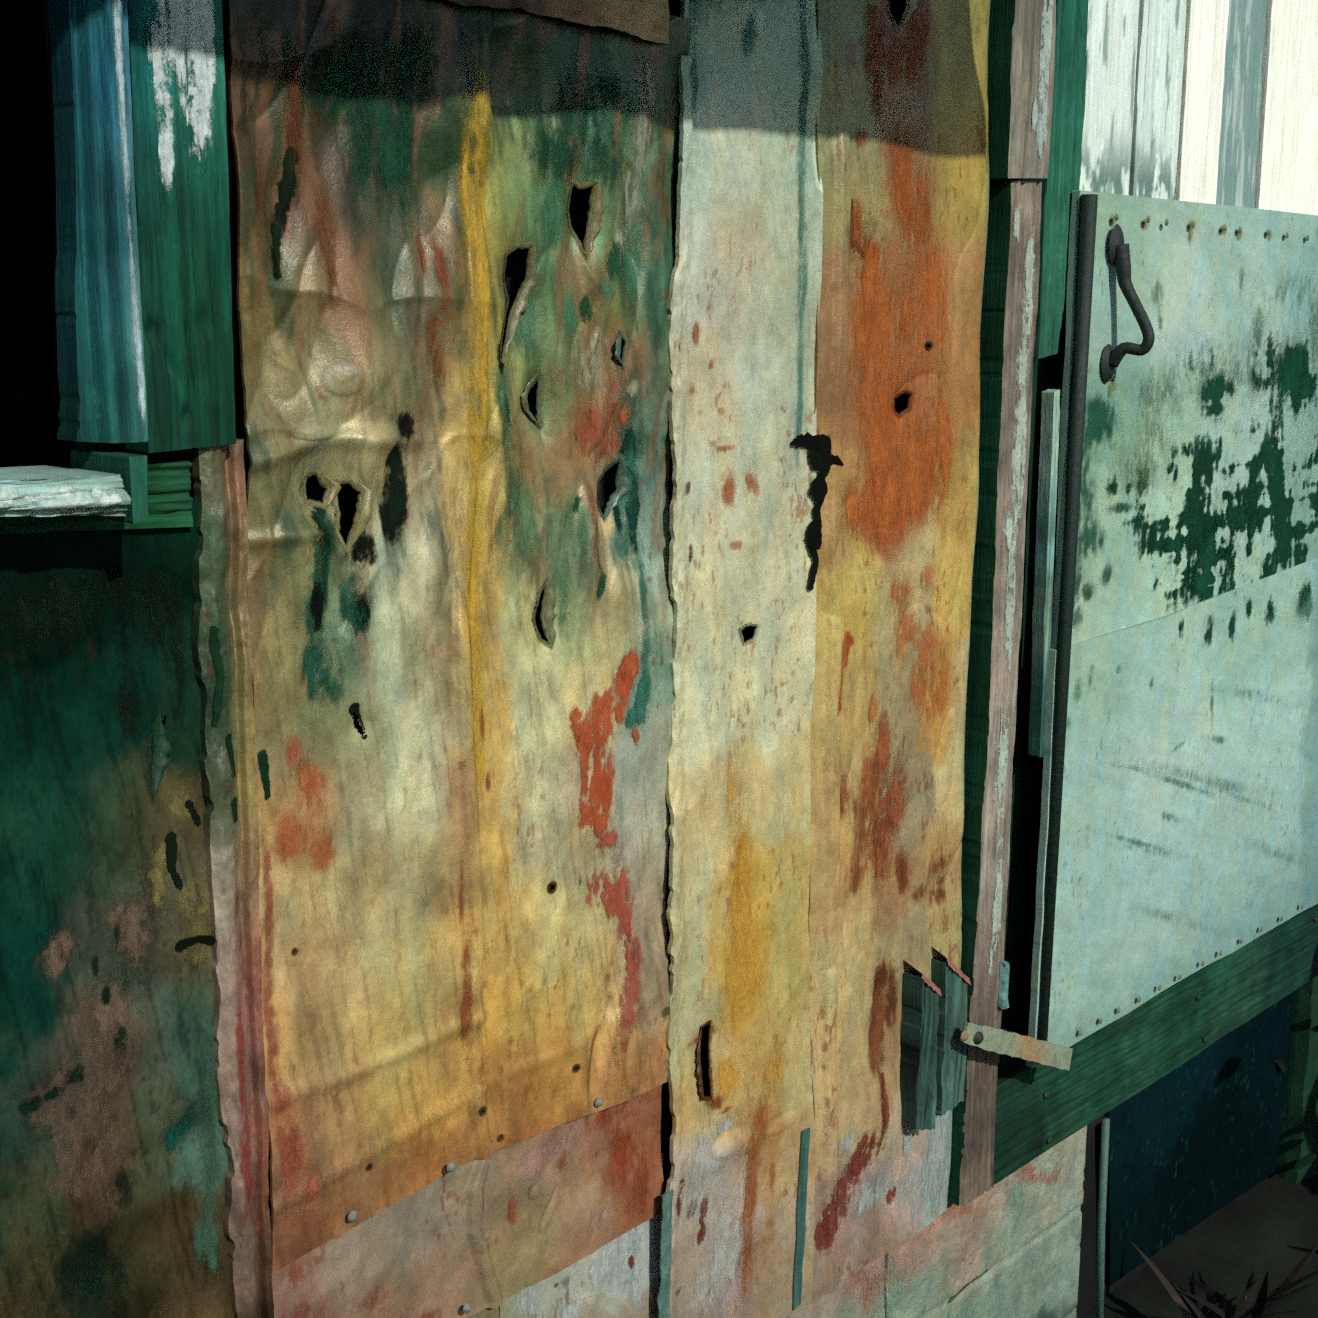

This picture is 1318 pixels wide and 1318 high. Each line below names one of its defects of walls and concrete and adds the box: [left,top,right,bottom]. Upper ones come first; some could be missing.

peeling [148,0,216,186]
rust [863,2,931,115]
spalling [580,296,593,322]
rust [845,129,953,551]
spalling [597,572,608,599]
spalling [613,426,640,554]
crack [792,432,844,591]
rust [892,566,948,721]
peeling [1073,332,1318,645]
rust [570,650,643,1052]
rust [841,695,946,904]
rust [814,960,898,1253]